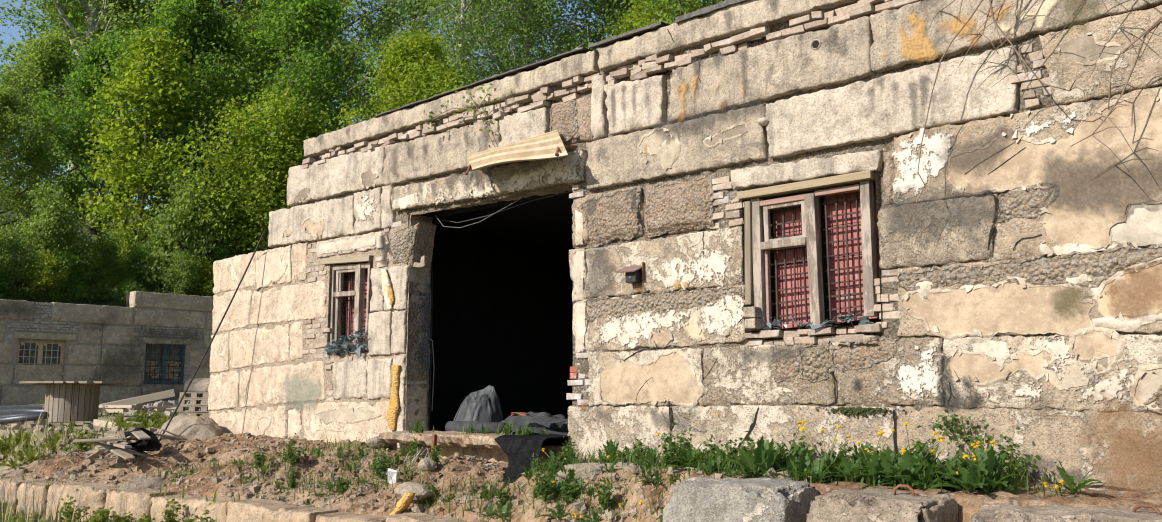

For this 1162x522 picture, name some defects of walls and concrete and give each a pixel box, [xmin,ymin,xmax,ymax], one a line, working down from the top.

rust [900,13,937,60]
rust [941,17,977,45]
flaking render [703,121,748,149]
crack [964,141,1042,250]
flaking render [572,125,745,408]
flaking render [772,88,1162,414]
crack [737,408,759,448]